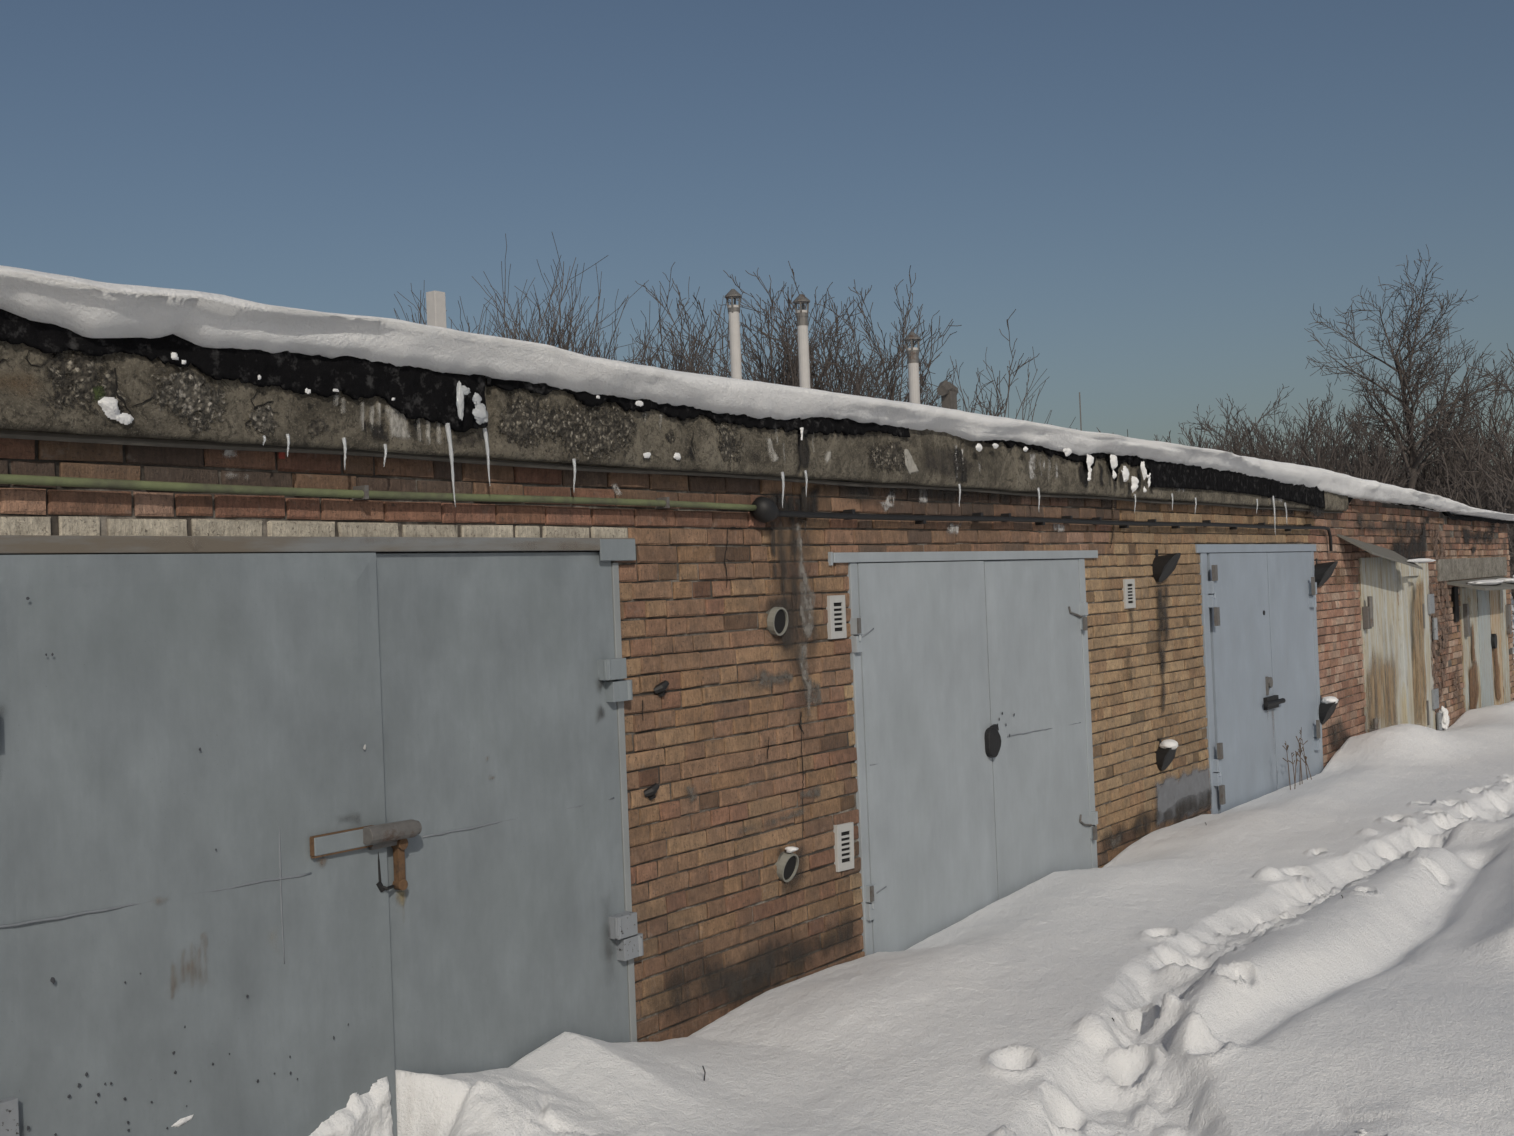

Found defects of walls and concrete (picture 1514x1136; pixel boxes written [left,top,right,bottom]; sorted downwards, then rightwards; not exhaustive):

damp [1079,464,1117,490]
damp [753,432,1059,672]
damp [671,921,853,1012]